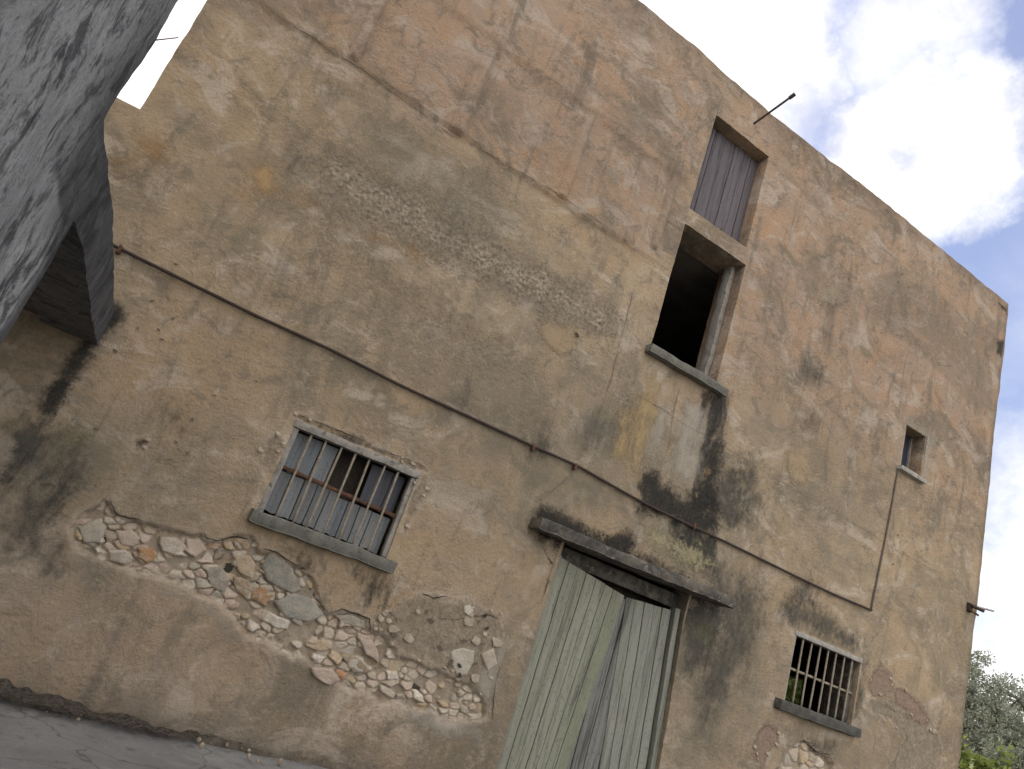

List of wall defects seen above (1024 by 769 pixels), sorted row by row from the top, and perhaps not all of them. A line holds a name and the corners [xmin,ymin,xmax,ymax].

damp [5,304,126,480]
flaking render [71,500,503,724]
damp [532,507,669,571]
damp [614,379,759,713]
flaking render [754,721,834,769]